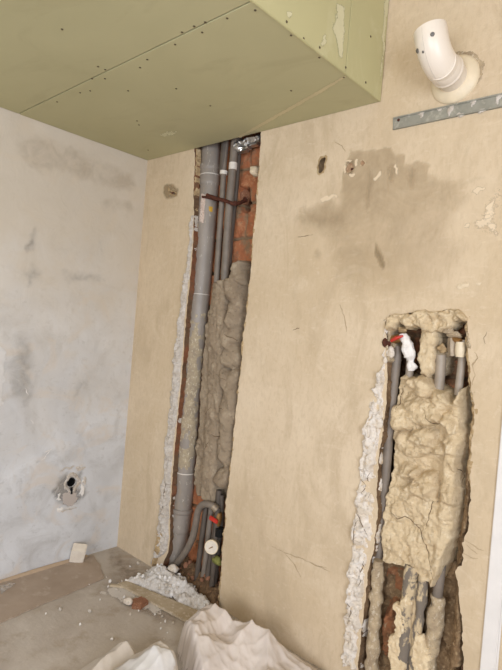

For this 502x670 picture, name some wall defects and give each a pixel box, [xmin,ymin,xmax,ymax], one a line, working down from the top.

flaking render [317,155,328,175]
flaking render [343,159,365,177]
flaking render [56,465,86,513]